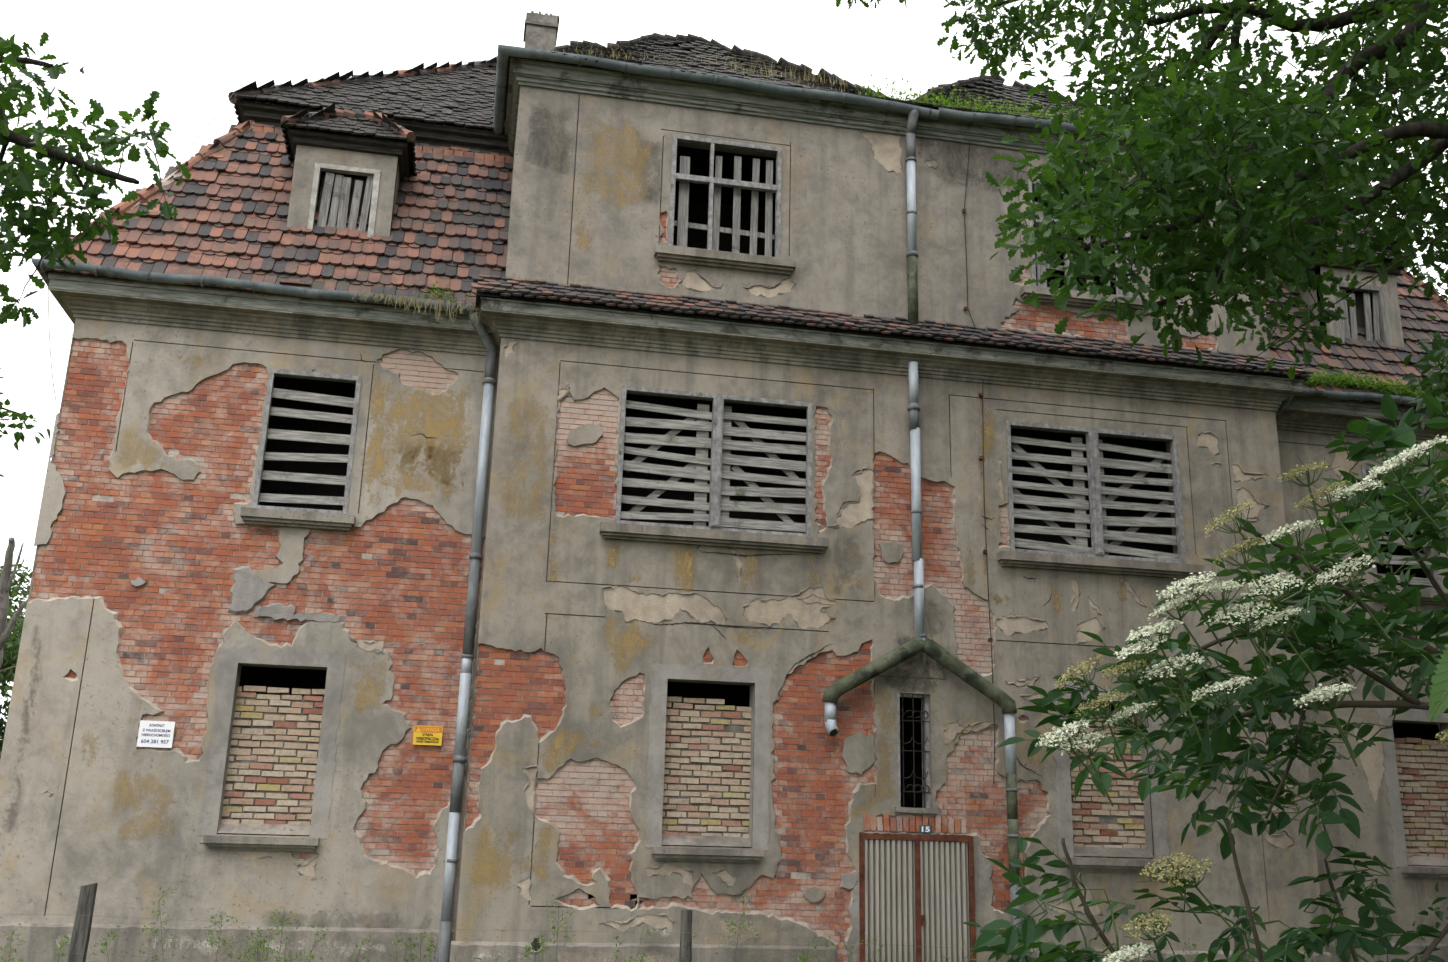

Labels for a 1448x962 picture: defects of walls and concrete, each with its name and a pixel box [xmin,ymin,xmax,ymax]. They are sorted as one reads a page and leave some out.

peeling [657,265,720,292]
peeling [743,277,797,298]
spalling [1001,266,1131,343]
leakage [368,395,464,495]
spalling [550,385,621,522]
spalling [27,324,567,879]
peeling [600,585,837,630]
spalling [814,406,1049,723]
spalling [523,639,1051,962]